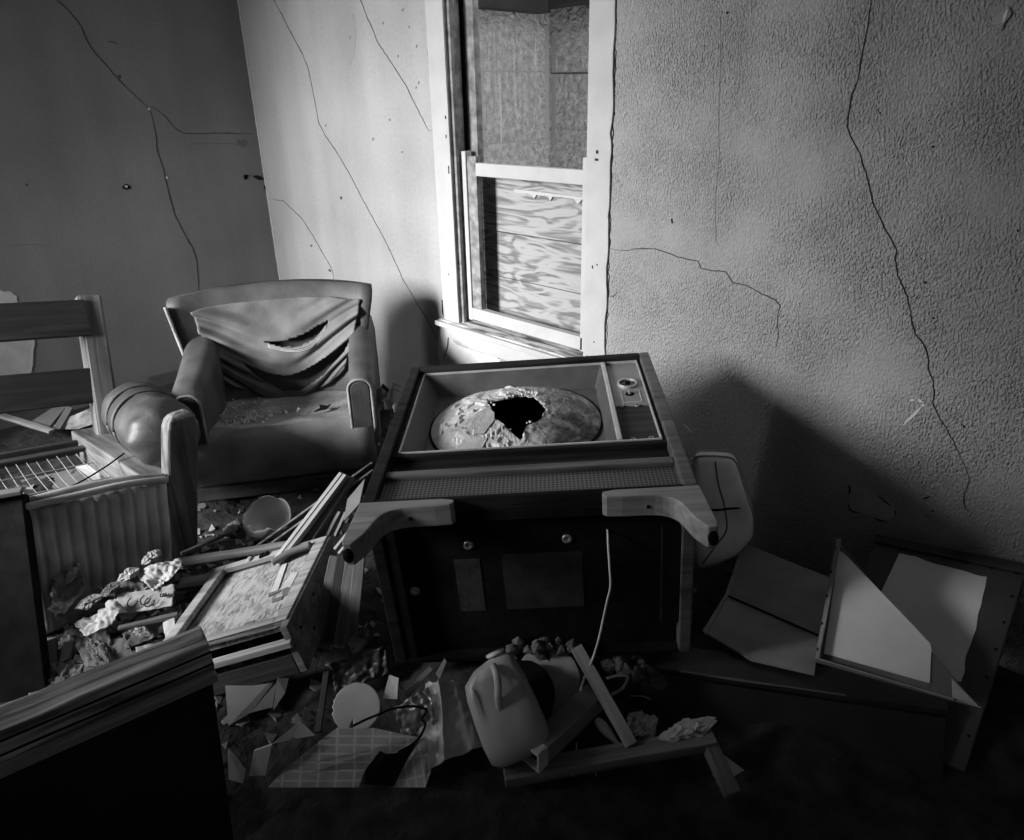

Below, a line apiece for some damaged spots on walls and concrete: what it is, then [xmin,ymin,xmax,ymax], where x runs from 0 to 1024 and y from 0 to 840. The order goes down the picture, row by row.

spalling [0,290,17,303]
spalling [0,340,33,375]
crack [57,0,244,290]
crack [269,0,449,358]
crack [605,1,781,348]
crack [846,1,970,512]